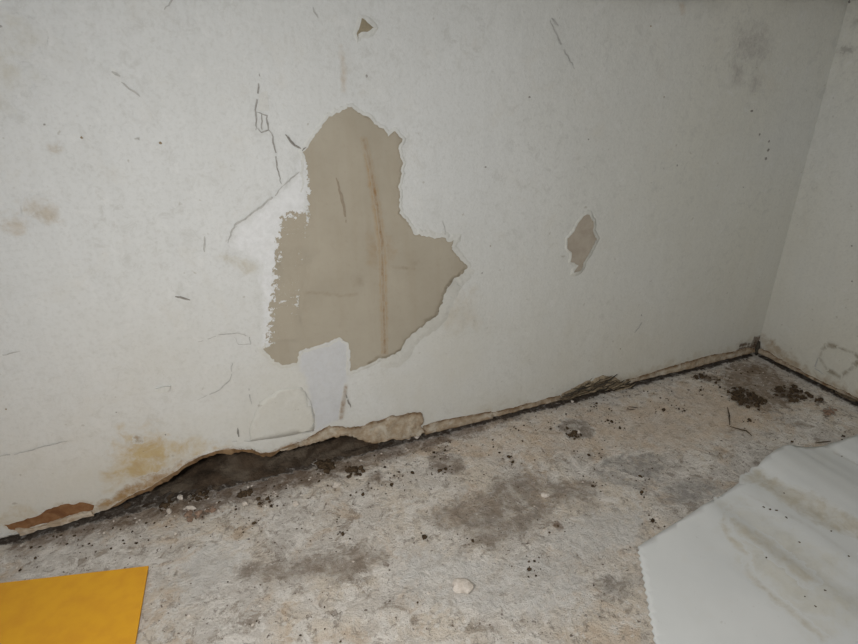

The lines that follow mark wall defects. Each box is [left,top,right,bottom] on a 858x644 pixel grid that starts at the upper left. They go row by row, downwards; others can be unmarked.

peeling [353,14,379,43]
peeling [226,103,475,376]
peeling [565,210,600,276]
flaking render [107,348,858,510]
flaking render [15,510,94,536]